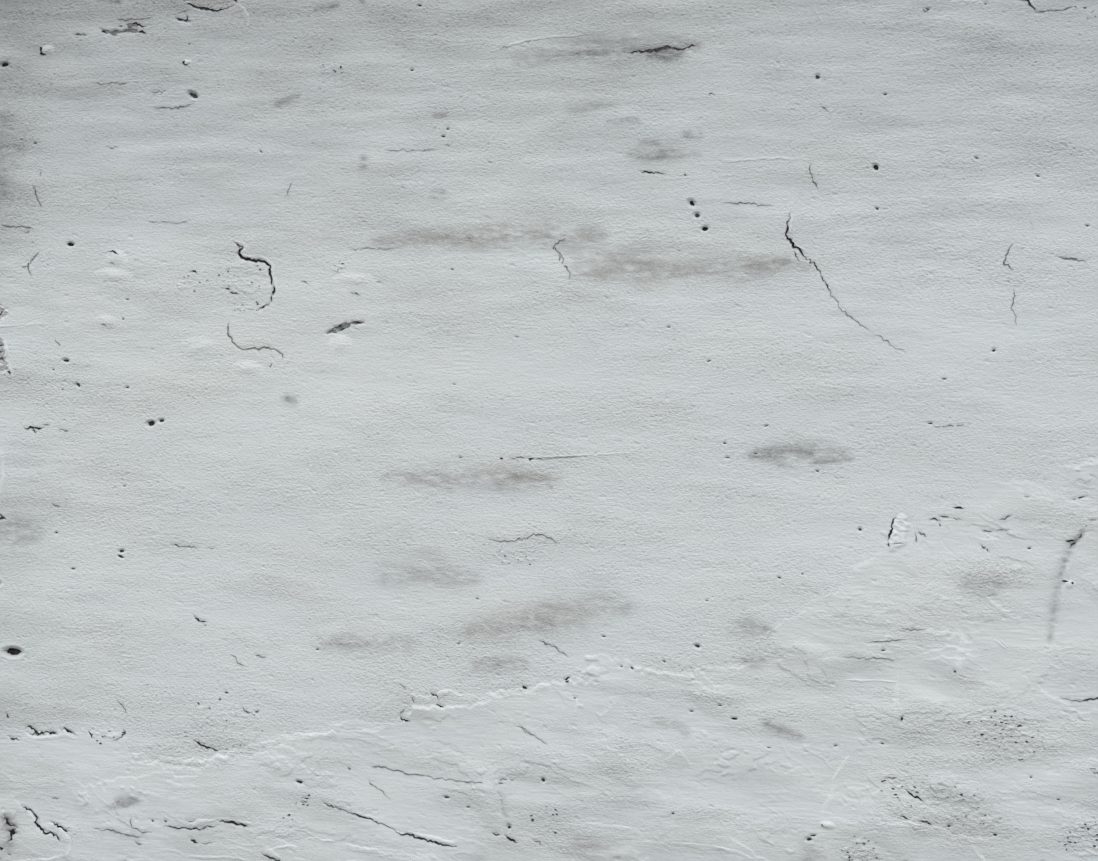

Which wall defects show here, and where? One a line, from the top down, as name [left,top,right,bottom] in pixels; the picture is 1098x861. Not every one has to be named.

crack [118,11,191,26]
crack [1024,0,1070,13]
crack [235,240,307,308]
crack [725,202,906,353]
crack [227,323,283,366]
crack [348,766,511,797]
crack [0,797,251,859]
crack [302,798,457,847]
crack [263,845,298,861]